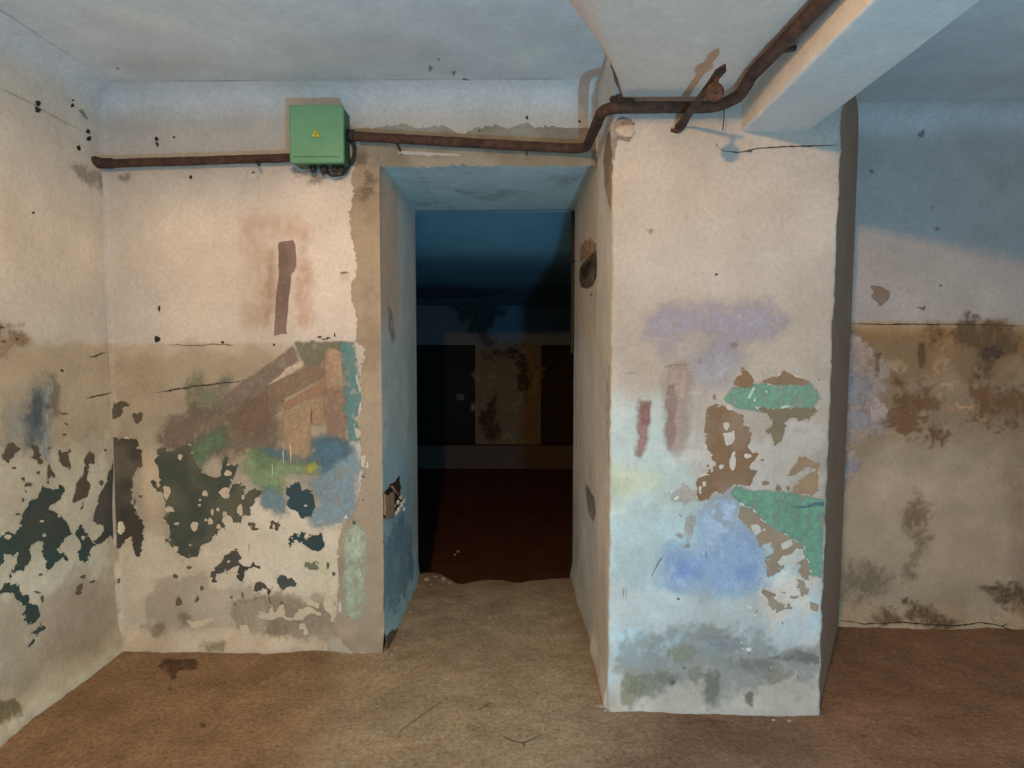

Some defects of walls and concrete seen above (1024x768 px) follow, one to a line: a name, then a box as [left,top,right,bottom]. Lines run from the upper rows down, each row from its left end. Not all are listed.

crack [716,144,832,153]
spalling [870,285,890,307]
crack [163,379,245,392]
peeling [175,115,636,654]
peeling [734,367,821,388]
peeling [112,401,143,424]
peeling [670,394,822,504]
peeling [0,437,280,647]
peeling [737,502,820,624]
damp [839,570,954,630]
crack [840,619,1009,629]
damp [985,582,1024,629]